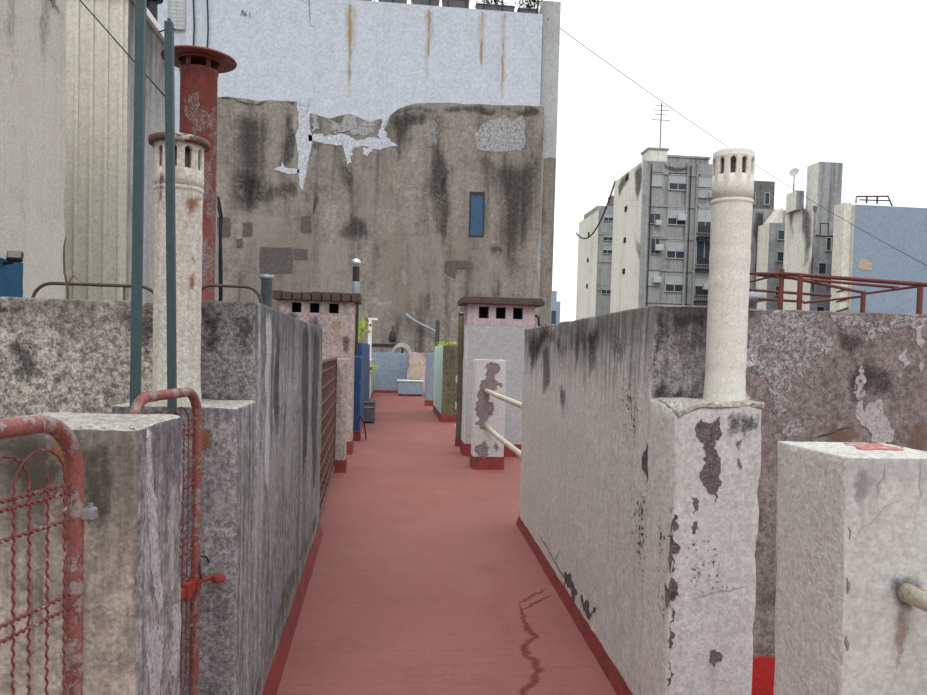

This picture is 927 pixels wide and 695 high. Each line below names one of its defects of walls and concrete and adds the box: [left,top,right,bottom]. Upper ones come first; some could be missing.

water stain [236,118,295,207]
peeling [311,113,392,167]
water stain [342,167,363,236]
water stain [393,106,448,240]
peeling [475,115,525,153]
water stain [492,162,538,258]
peeling [475,362,503,429]
water stain [529,326,600,388]
peeling [746,310,927,438]
peeling [844,366,904,451]
peeling [695,417,722,503]
spalling [664,508,681,649]